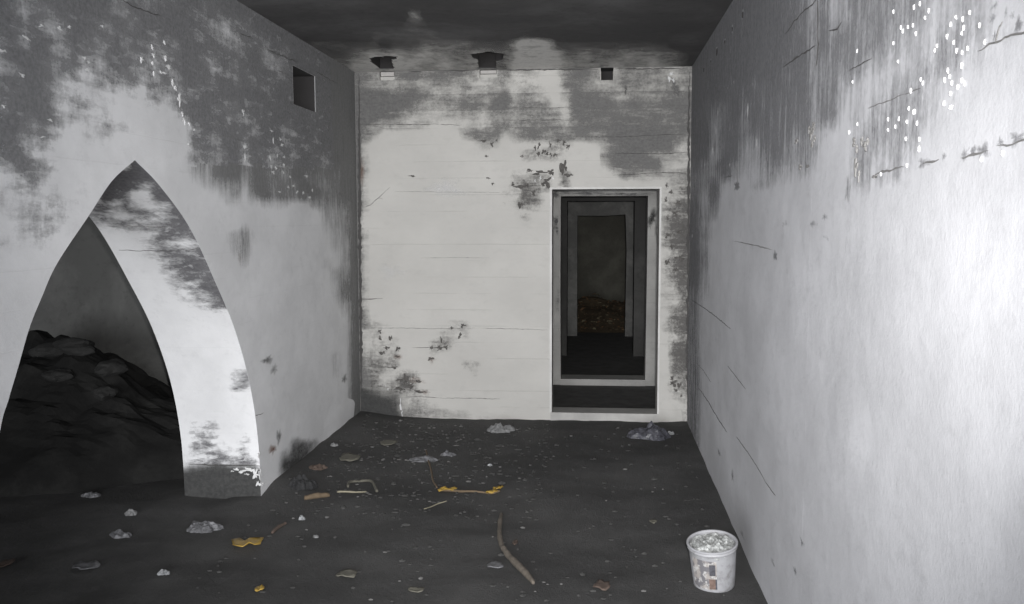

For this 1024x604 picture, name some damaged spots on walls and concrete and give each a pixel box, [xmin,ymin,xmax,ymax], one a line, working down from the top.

crack [979,21,1024,51]
leakage [29,55,80,141]
leakage [0,148,45,187]
spalling [511,139,573,209]
crack [875,139,1024,175]
leakage [92,192,191,289]
leakage [184,0,742,441]
spalling [378,330,426,416]